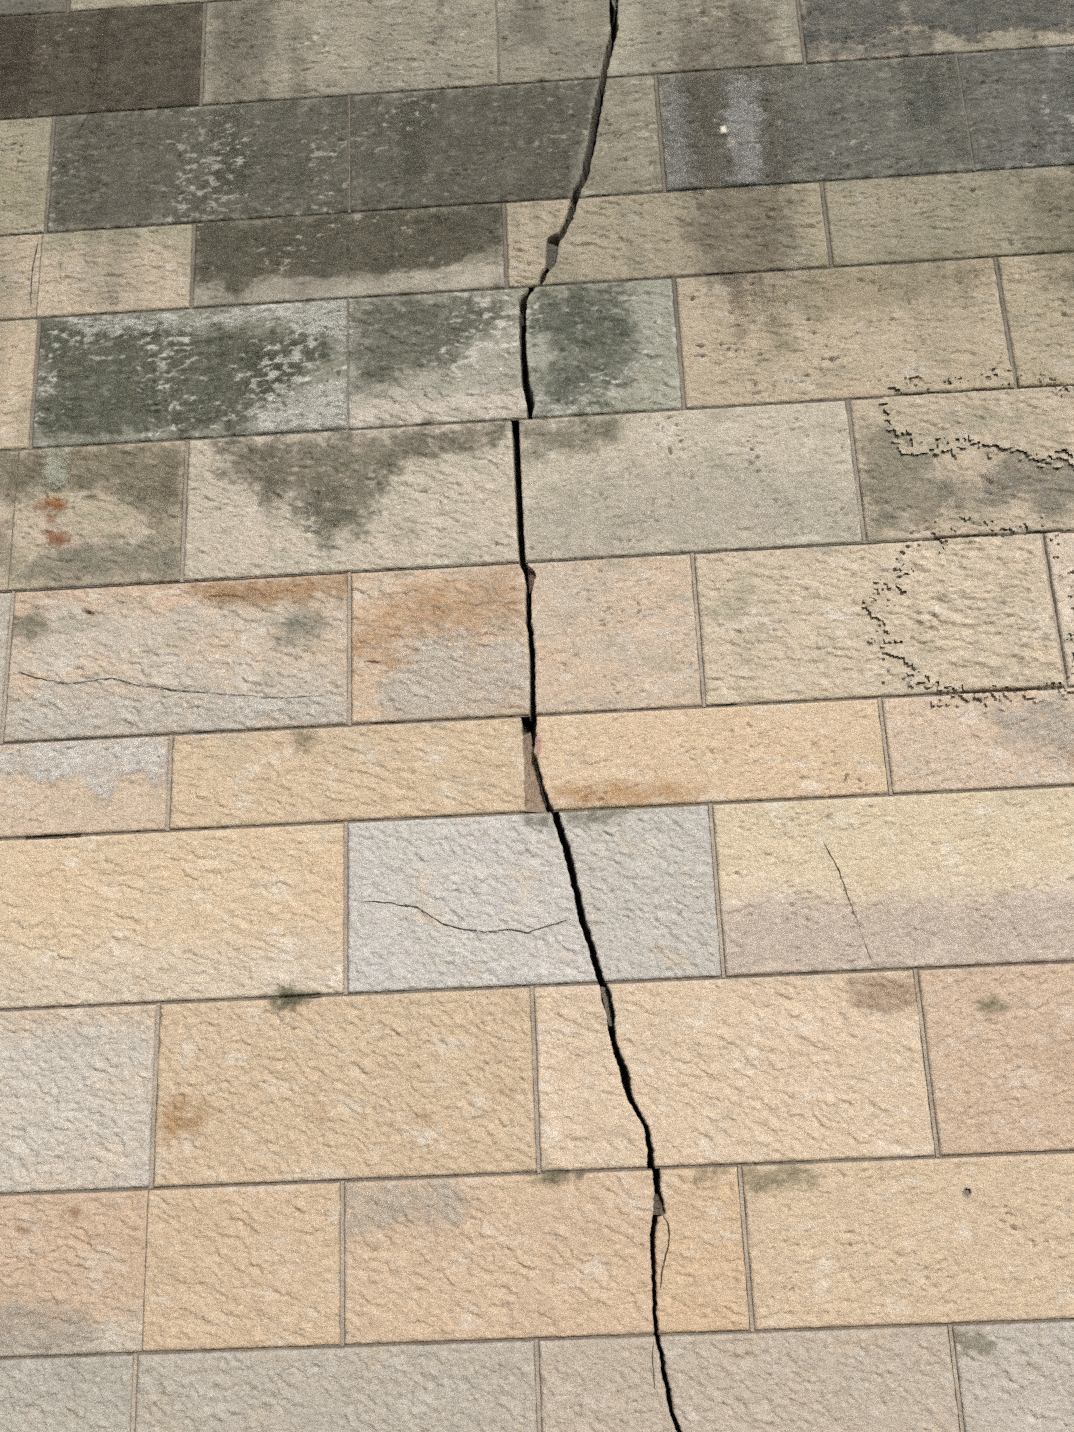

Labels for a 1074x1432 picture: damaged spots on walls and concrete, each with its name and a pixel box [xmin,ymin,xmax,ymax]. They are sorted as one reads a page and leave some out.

damp [802,0,1074,69]
damp [0,4,592,337]
damp [255,380,351,433]
damp [44,449,69,486]
corrosion [43,499,67,509]
corrosion [49,533,64,544]
crack [364,0,682,1432]